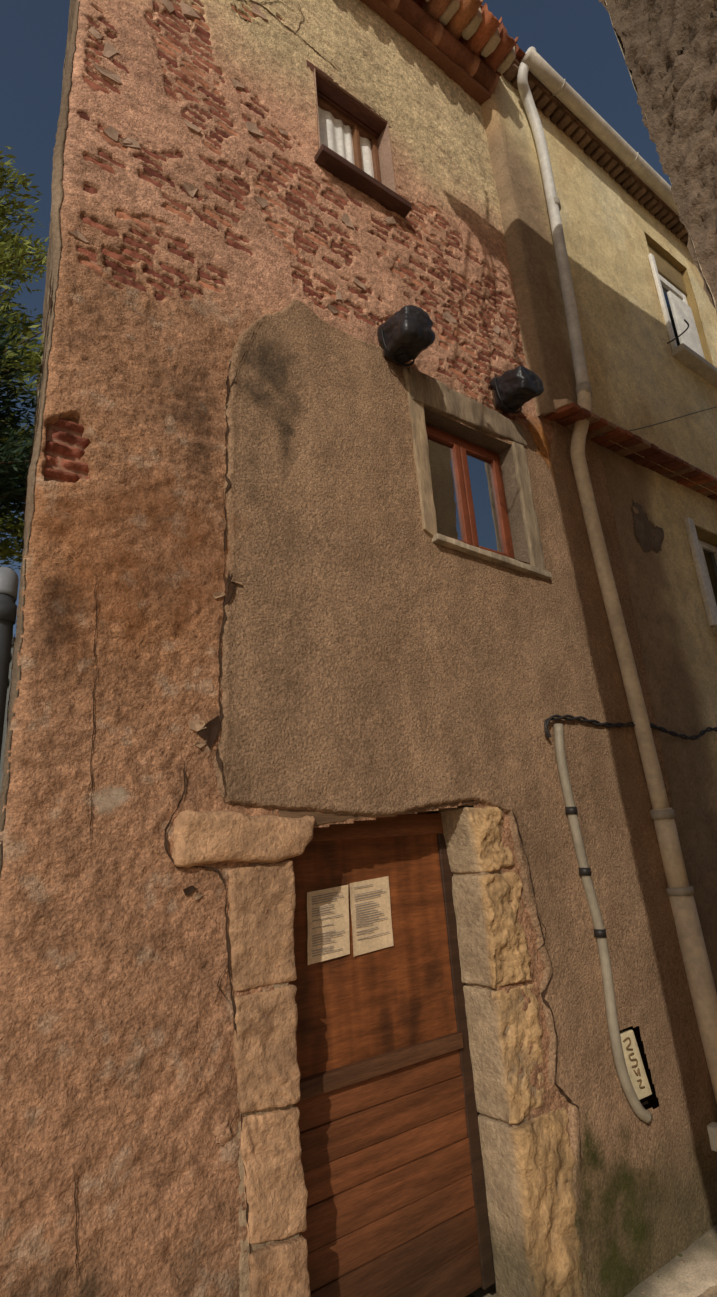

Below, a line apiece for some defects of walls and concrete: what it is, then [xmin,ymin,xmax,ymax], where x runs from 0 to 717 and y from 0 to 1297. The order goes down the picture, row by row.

crack [233,0,334,66]
spalling [68,0,549,464]
spalling [44,419,90,483]
crack [204,324,258,798]
crack [164,764,238,1041]
crack [512,810,582,1165]
crack [230,1103,251,1269]